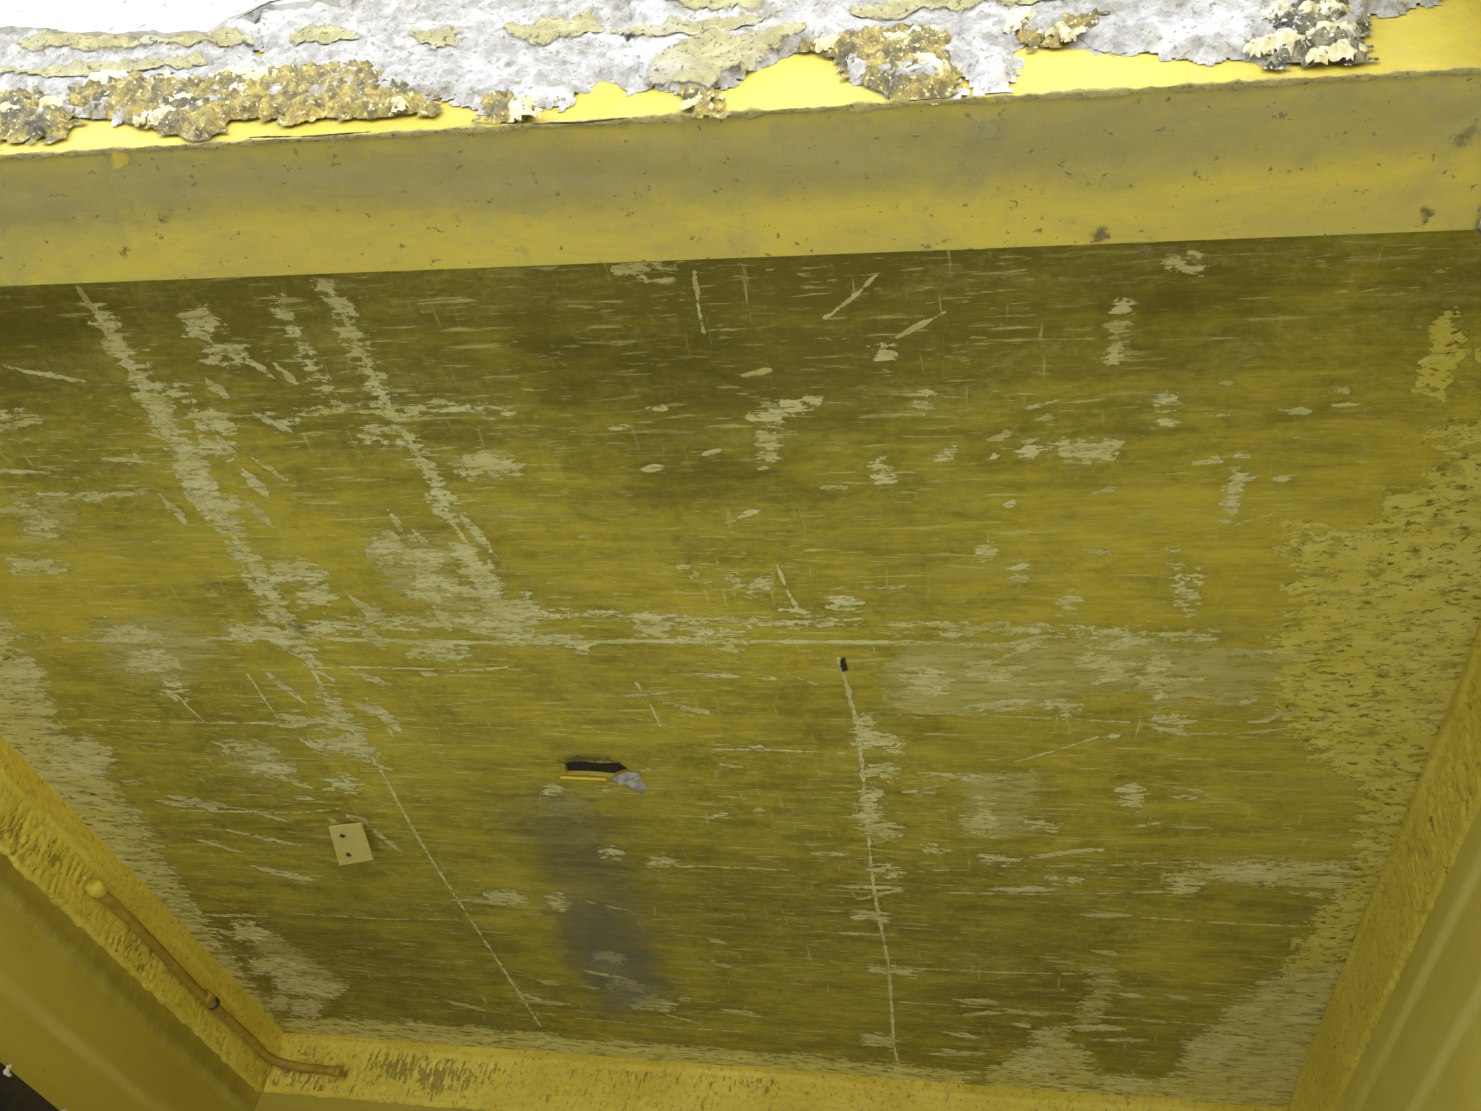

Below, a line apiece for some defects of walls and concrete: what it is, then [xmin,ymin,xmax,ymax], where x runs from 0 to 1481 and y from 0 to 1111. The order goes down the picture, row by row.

flaking render [0,0,1481,171]
peeling [610,261,679,285]
peeling [1159,248,1216,282]
peeling [0,296,1481,1109]